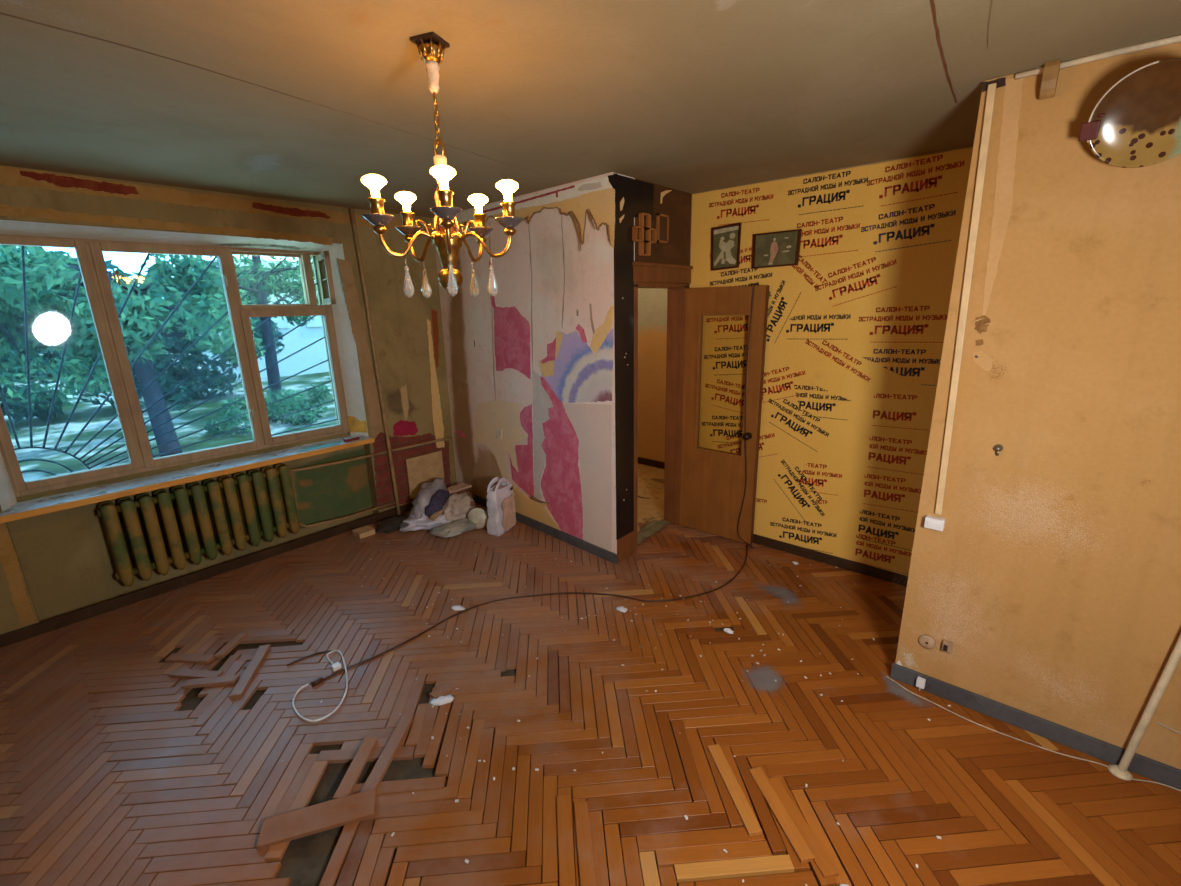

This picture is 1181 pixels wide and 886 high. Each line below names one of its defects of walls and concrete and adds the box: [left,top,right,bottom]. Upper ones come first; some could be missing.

crack [930,0,957,103]
flaking render [532,370,553,499]